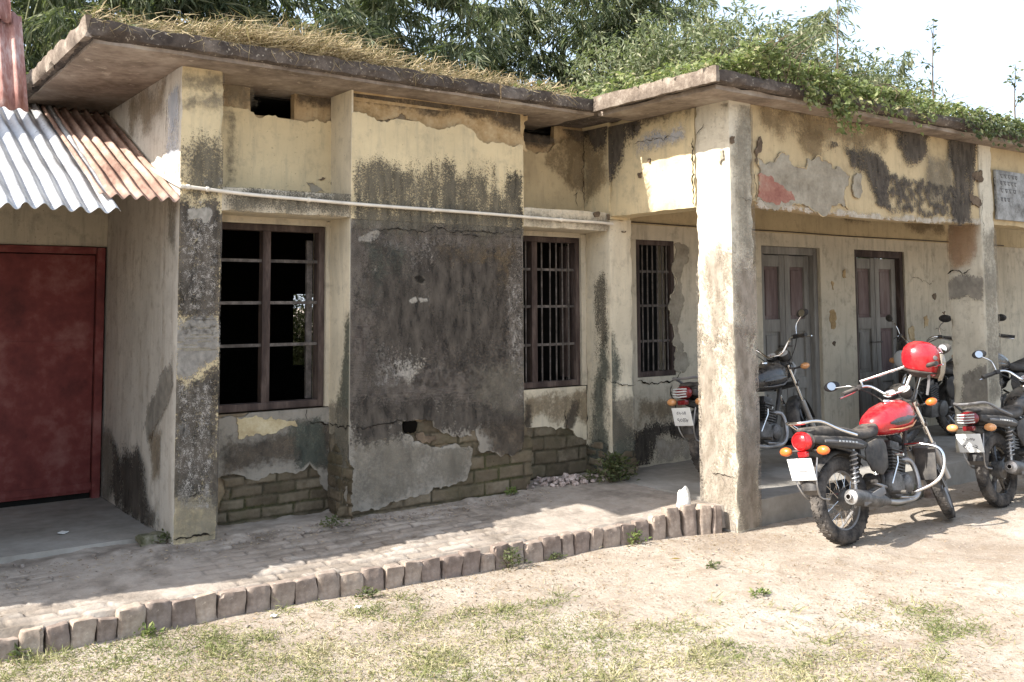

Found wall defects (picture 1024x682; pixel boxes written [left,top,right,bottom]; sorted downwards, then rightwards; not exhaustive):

flaking render [353,91,528,152]
crack [363,225,519,238]
water stain [523,133,605,199]
peeling [754,136,863,217]
water stain [762,106,979,235]
water stain [101,127,587,543]
crack [305,410,403,430]
flaking render [175,201,639,526]
water stain [593,271,635,477]
peeling [667,242,689,373]